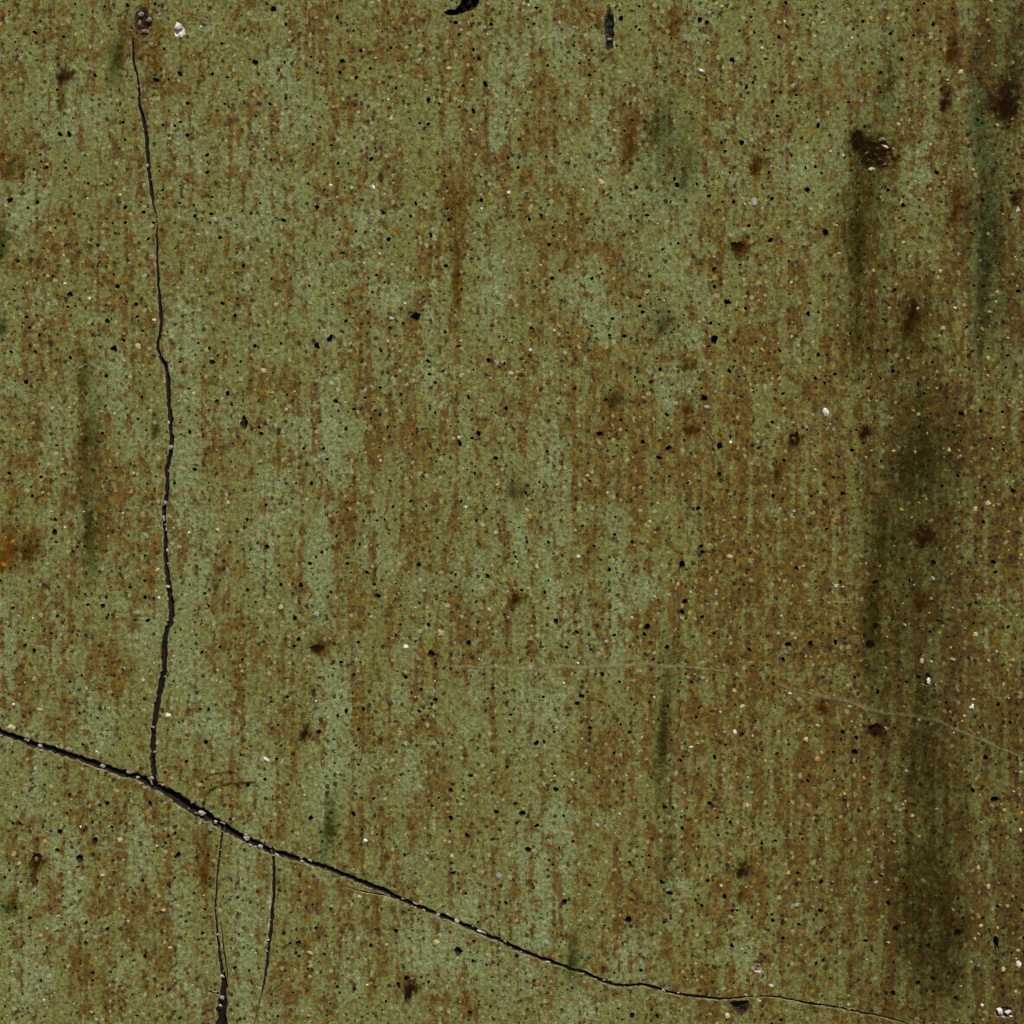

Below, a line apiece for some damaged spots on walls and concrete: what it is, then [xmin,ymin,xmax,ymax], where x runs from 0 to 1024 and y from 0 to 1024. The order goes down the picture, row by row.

rust [55,62,75,83]
rust [939,86,953,112]
rust [990,79,1019,128]
crack [131,38,176,785]
rust [0,535,37,572]
crack [453,662,728,672]
rust [299,722,312,740]
crack [777,684,1022,757]
crack [0,728,908,1024]
rust [735,861,751,879]
rust [404,978,421,1002]